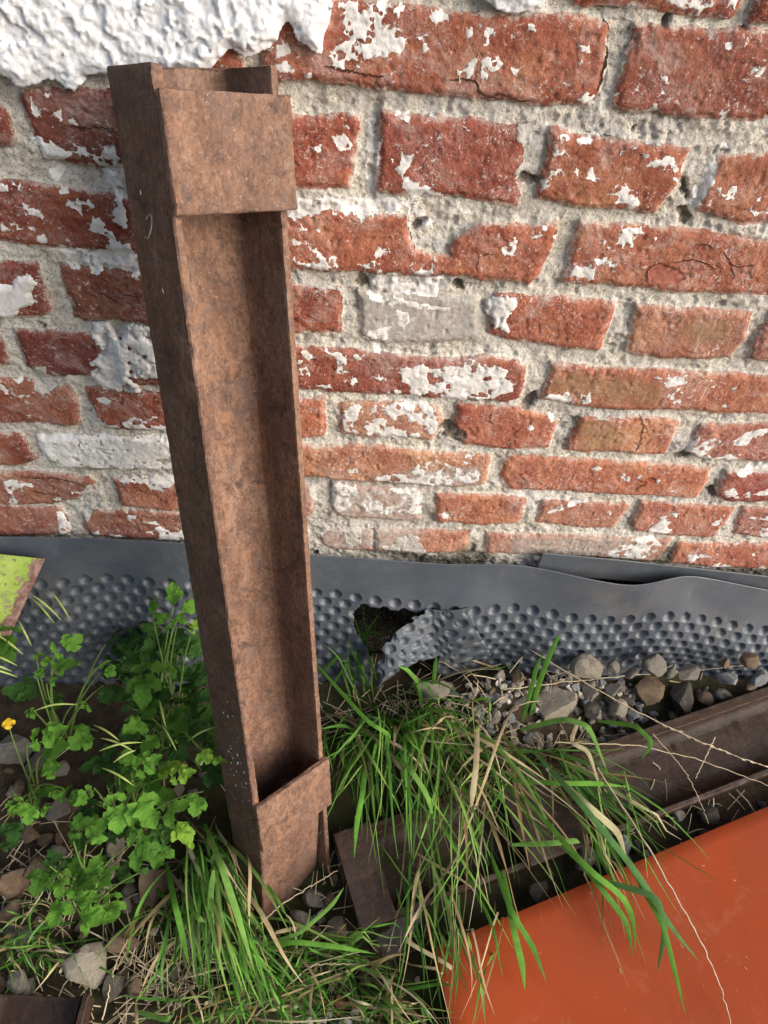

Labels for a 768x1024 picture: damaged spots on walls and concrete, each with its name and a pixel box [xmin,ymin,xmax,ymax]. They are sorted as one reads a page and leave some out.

peeling [0,0,449,126]
crack [450,71,534,102]
crack [597,48,608,91]
crack [646,244,755,283]
peeling [37,321,174,492]
peeling [341,359,516,439]